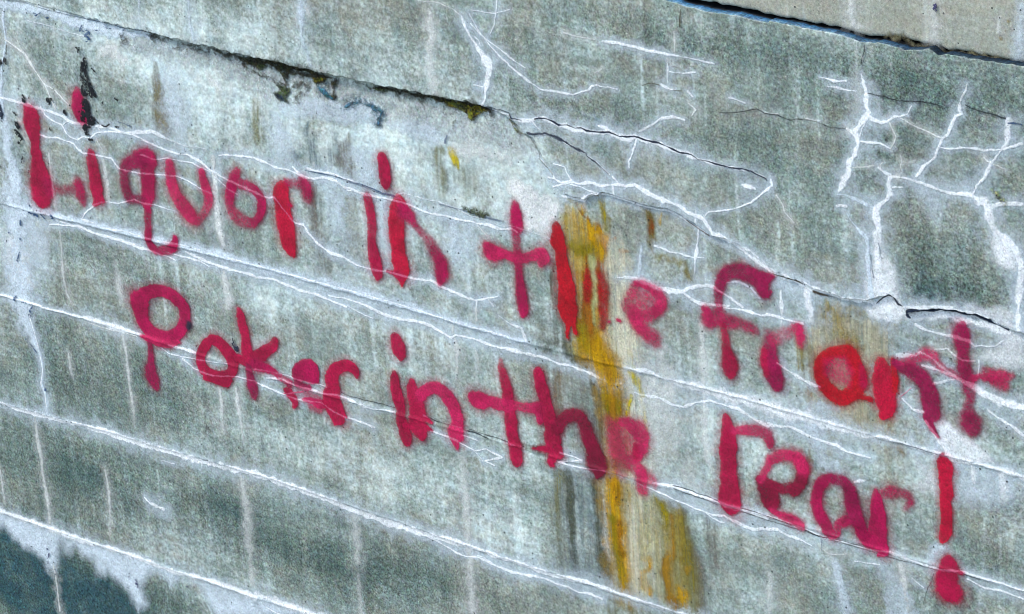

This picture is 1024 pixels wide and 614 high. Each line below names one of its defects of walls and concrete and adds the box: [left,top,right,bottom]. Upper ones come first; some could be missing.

crack [0,38,512,237]
crack [49,200,872,466]
corrosion [564,192,648,429]
corrosion [640,206,663,243]
crack [418,0,1024,437]
corrosion [606,436,698,614]
crack [557,450,937,592]